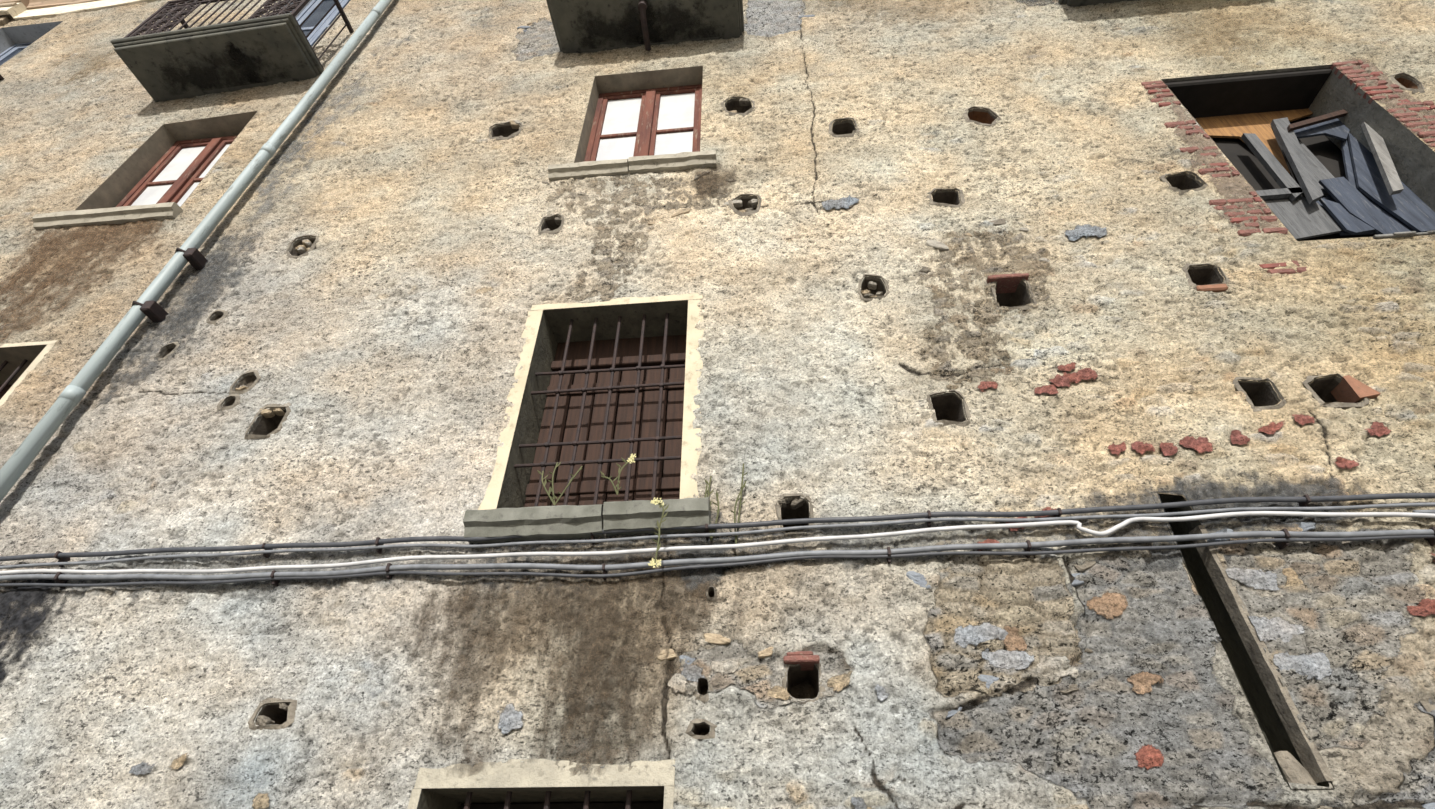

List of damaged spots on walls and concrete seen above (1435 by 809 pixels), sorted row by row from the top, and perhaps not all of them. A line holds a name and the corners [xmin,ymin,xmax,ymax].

crack [631,25,877,213]
flaking render [1141,80,1288,237]
flaking render [1330,58,1435,151]
leakage [0,573,66,681]
flaking render [906,534,1284,809]
flaking render [1207,522,1426,749]
flaking render [1318,695,1435,809]